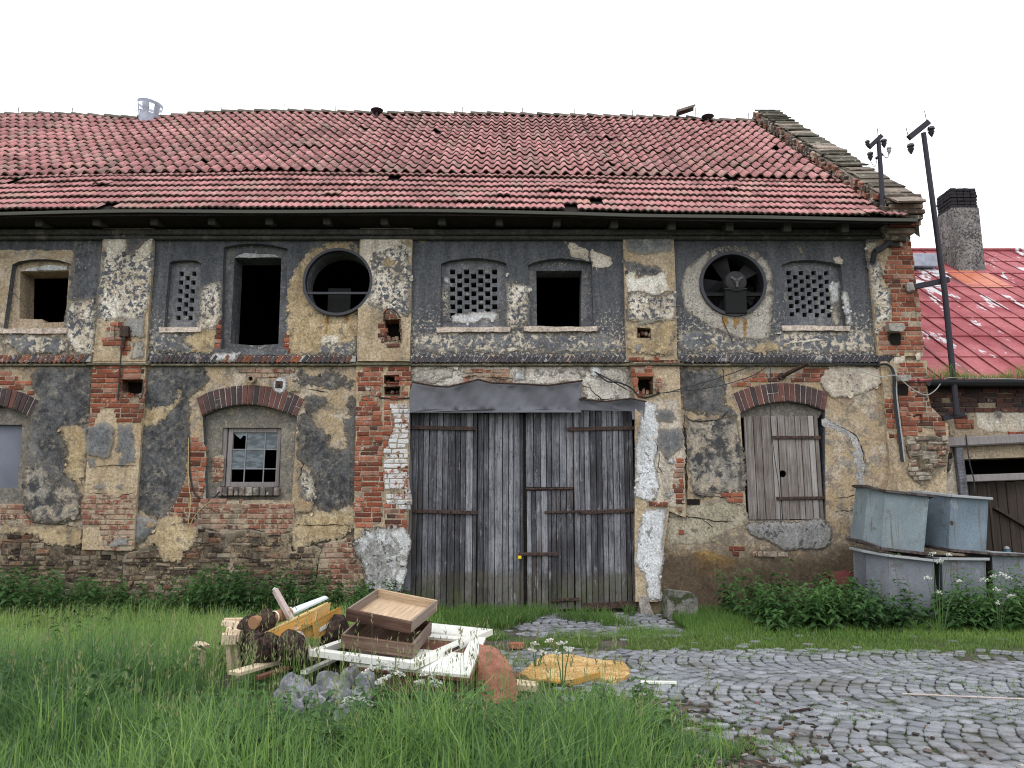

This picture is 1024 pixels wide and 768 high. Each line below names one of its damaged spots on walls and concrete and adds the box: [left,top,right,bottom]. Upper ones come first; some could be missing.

corrosion [723,317,747,338]
peeling [0,228,1024,611]
crack [656,408,740,527]
crack [821,418,866,512]